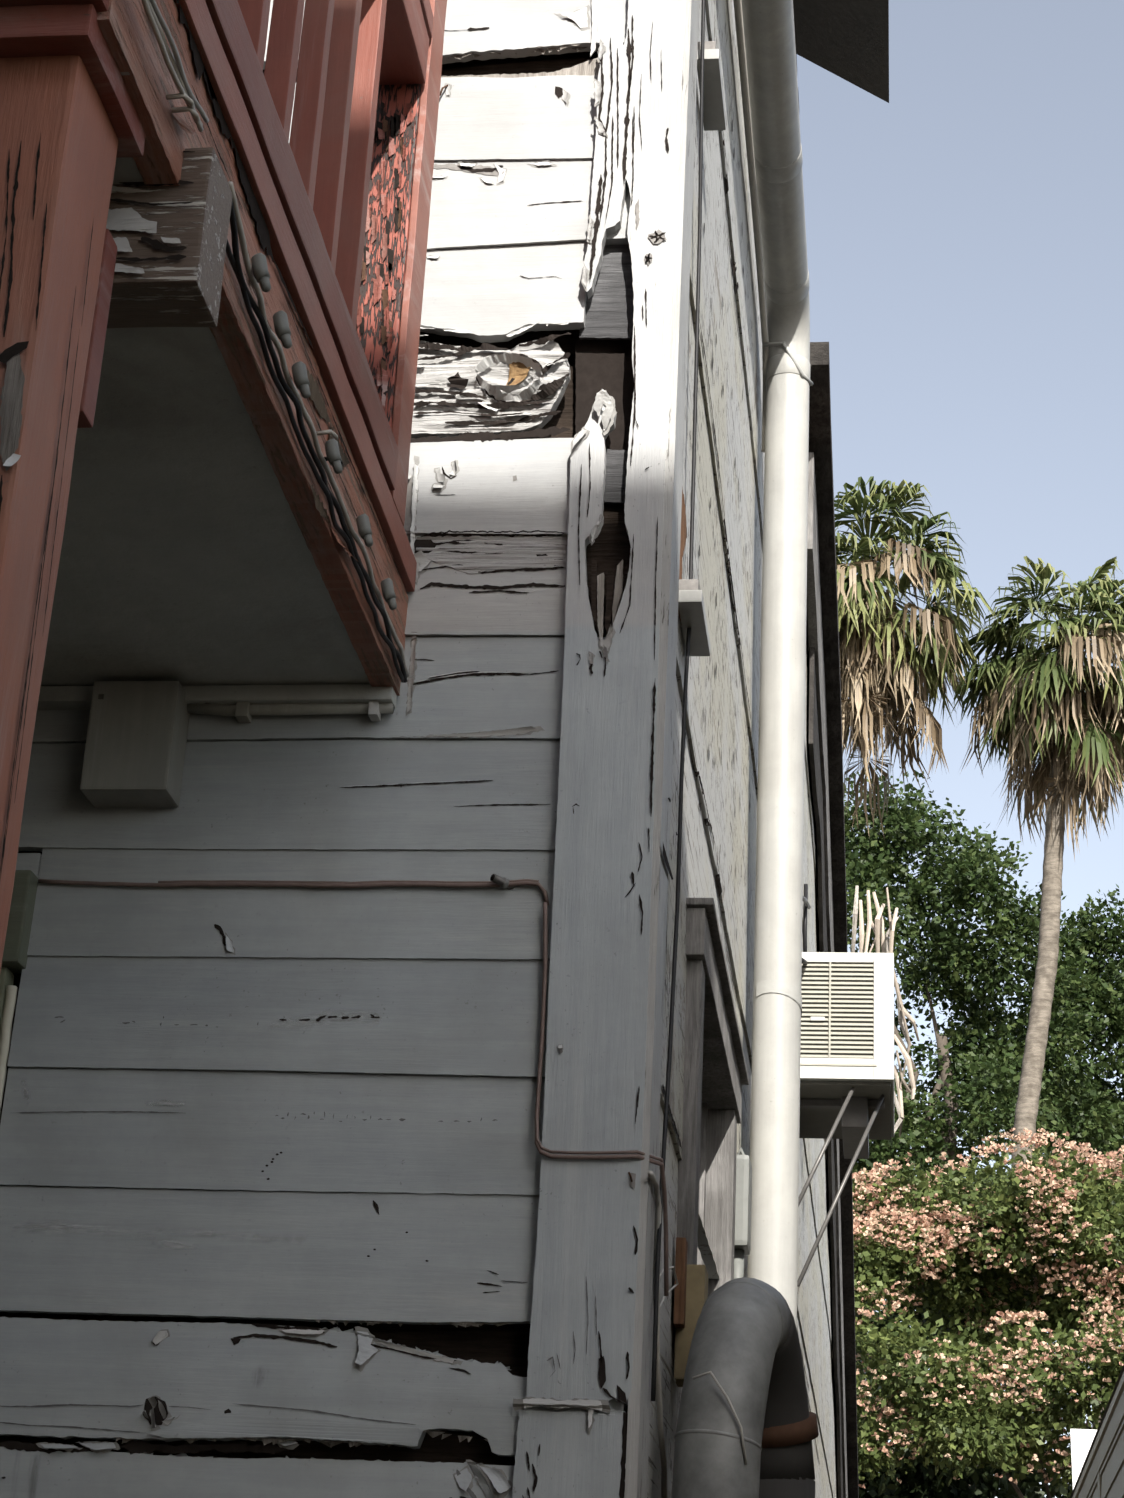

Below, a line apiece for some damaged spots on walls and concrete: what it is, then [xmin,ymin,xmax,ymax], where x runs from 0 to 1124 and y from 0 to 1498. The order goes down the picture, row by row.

peeling [106,186,181,274]
peeling [357,102,412,412]
peeling [420,326,472,336]
peeling [506,321,569,337]
peeling [576,643,610,676]
crack [233,1323,470,1374]
crack [0,1404,416,1433]